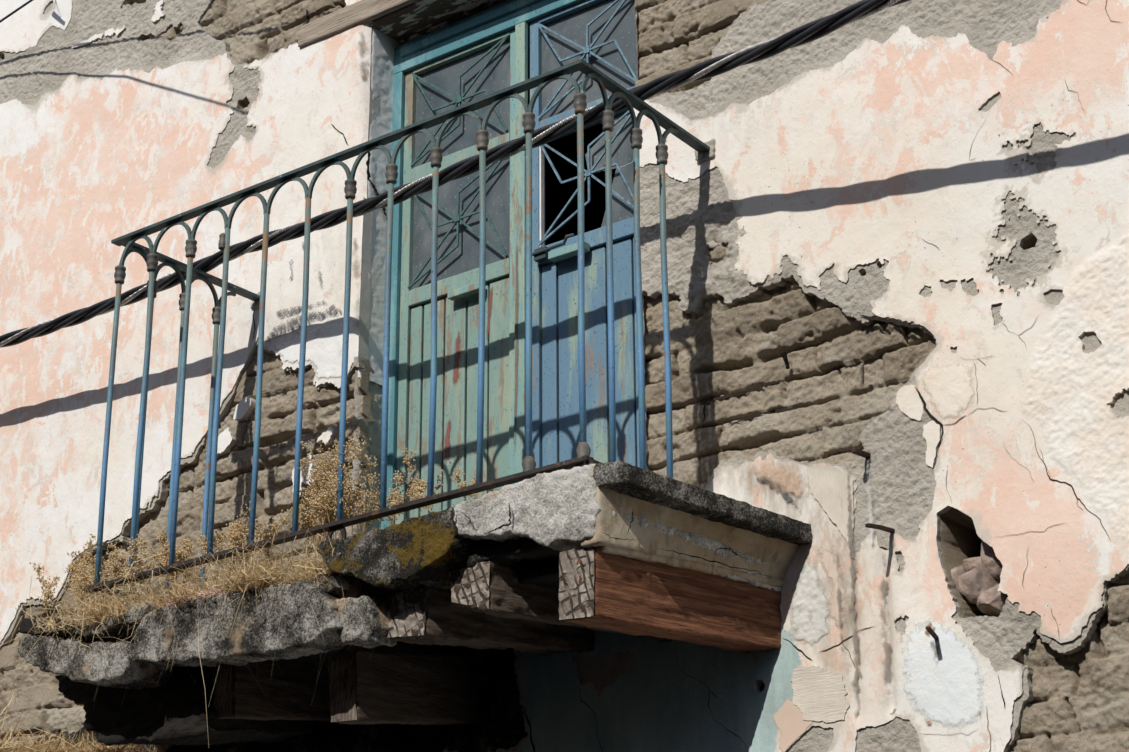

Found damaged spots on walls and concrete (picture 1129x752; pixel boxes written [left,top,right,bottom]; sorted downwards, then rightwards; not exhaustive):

peeling [0,0,360,169]
peeling [634,0,1064,121]
peeling [1003,123,1076,173]
flaking render [0,341,528,752]
flaking render [640,163,1129,752]
crack [915,356,1111,588]